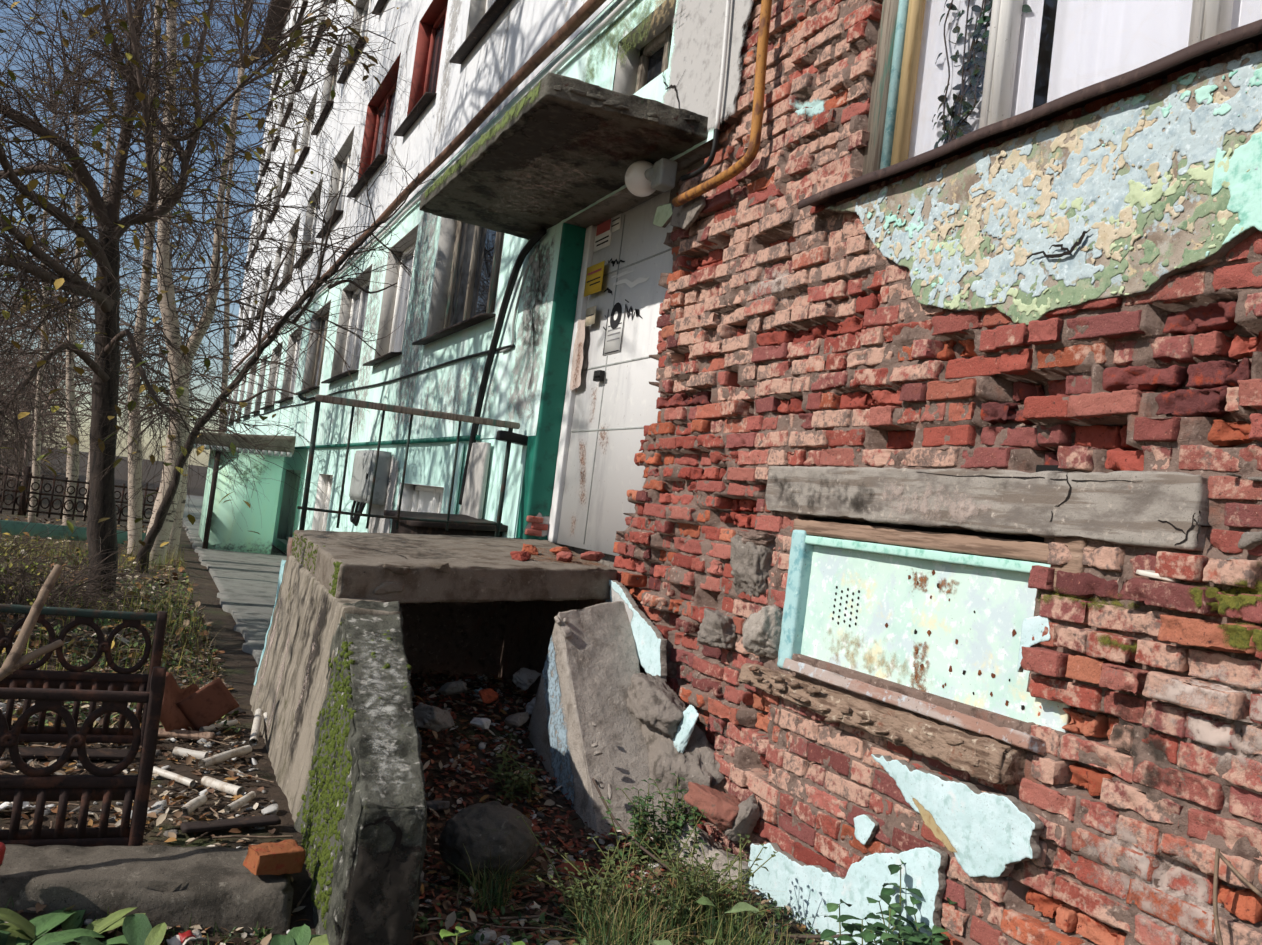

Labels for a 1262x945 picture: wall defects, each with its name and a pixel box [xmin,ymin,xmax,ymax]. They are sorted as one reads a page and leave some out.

peeling [825,50,1262,325]
crack [1027,229,1091,259]
crack [922,472,1139,521]
crack [1158,511,1212,545]
rust [908,570,955,601]
rust [911,629,931,692]
rust [942,666,1025,710]
spalling [684,782,741,834]